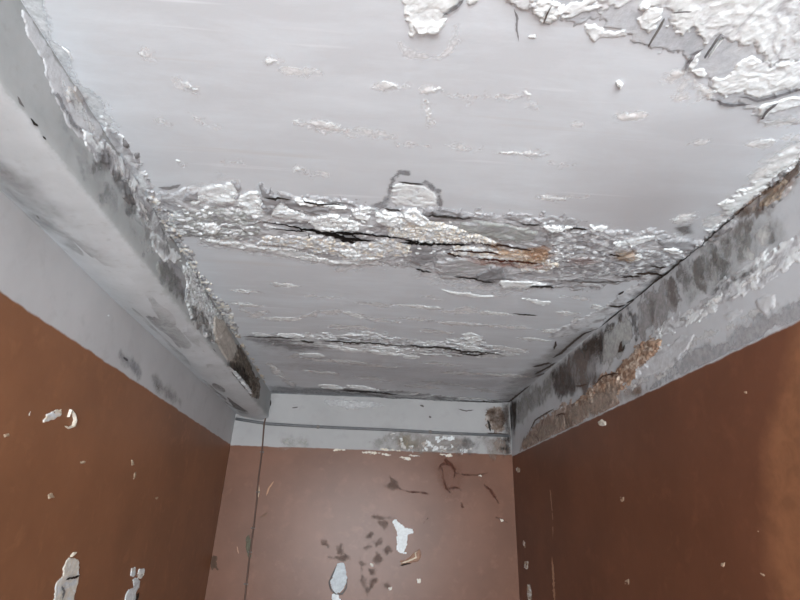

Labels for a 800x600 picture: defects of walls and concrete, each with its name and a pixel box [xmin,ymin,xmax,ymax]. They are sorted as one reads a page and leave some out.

crack [263,222,545,264]
spalling [21,0,800,450]
crack [424,213,471,221]
crack [242,336,499,356]
damp [492,227,775,454]
damp [390,433,472,454]
peeling [370,519,422,587]
peeling [53,552,80,600]
peeling [124,567,145,600]
peeling [329,556,348,600]